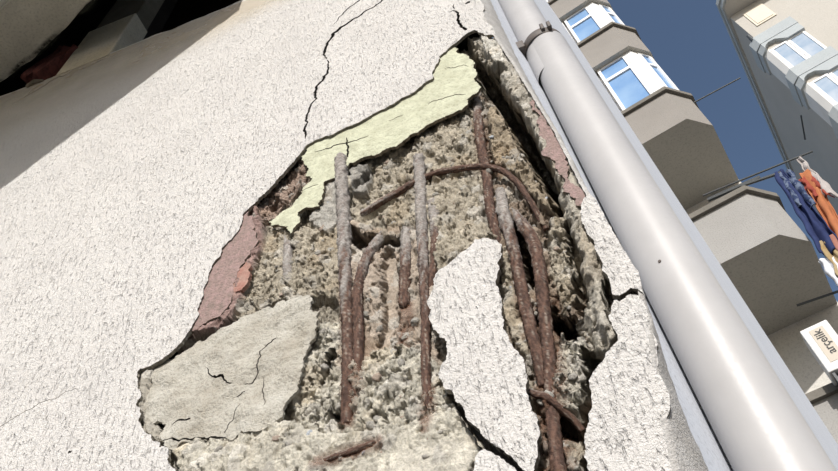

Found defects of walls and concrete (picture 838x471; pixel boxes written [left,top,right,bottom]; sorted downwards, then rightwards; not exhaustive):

crack [450,5,470,39]
crack [303,0,383,157]
spalling [138,35,618,471]
crack [162,338,276,442]
crack [456,406,523,471]